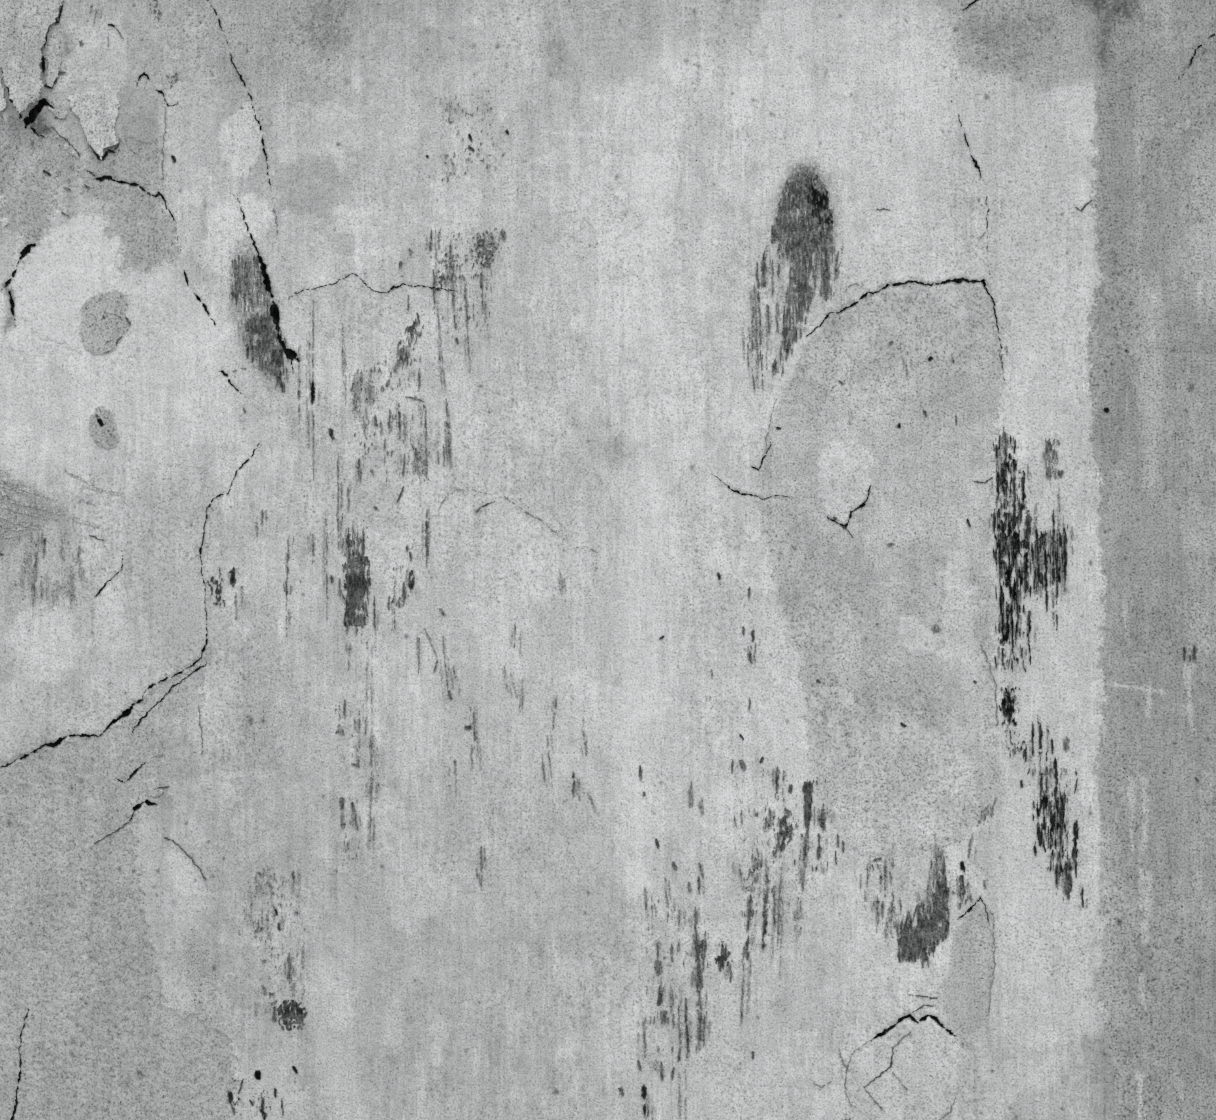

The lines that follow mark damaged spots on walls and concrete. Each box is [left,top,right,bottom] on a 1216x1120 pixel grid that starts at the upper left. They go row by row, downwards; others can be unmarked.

spalling [0,0,181,274]
water stain [229,254,321,481]
crack [207,0,455,371]
water stain [742,175,839,381]
crack [806,96,1005,380]
crack [0,443,260,767]
water stain [283,229,494,862]
water stain [991,427,1074,665]
crack [95,762,169,844]
water stain [658,862,707,1119]
water stain [728,787,826,1027]
crack [813,994,957,1111]